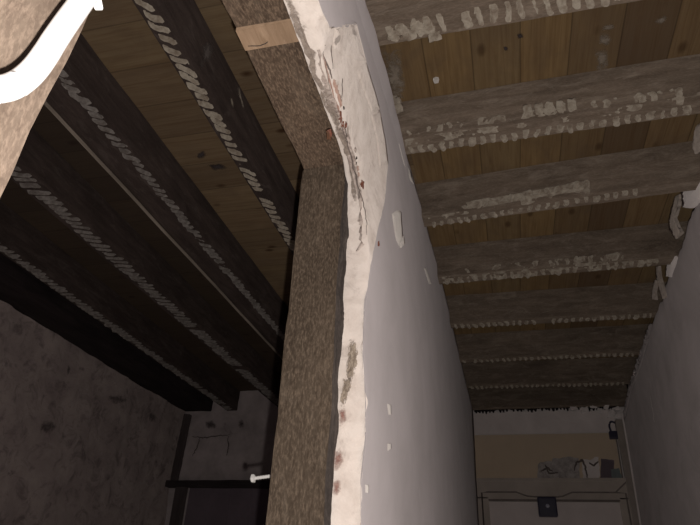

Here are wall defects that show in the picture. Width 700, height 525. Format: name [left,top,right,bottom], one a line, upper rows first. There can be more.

peeling [333,23,389,167]
flaking render [317,50,365,252]
flaking render [692,124,700,154]
peeling [392,210,405,248]
flaking render [668,183,700,239]